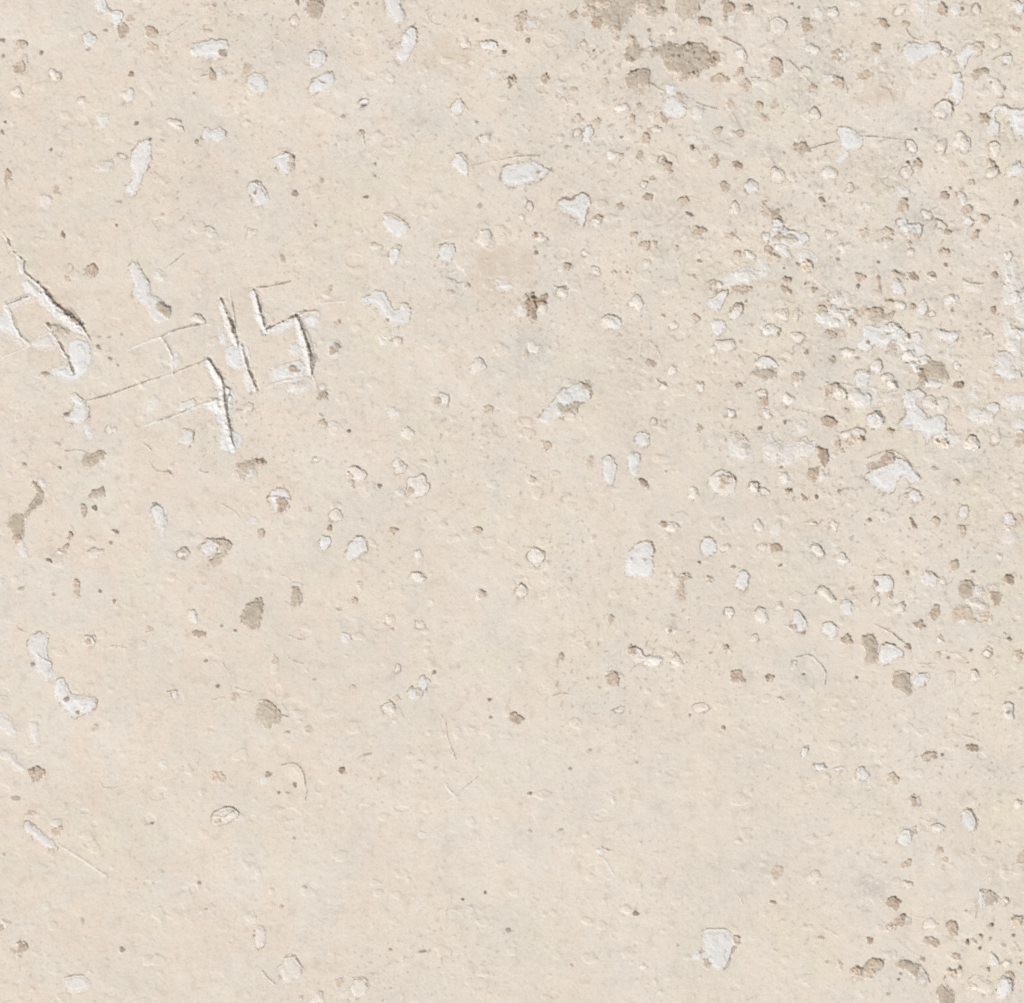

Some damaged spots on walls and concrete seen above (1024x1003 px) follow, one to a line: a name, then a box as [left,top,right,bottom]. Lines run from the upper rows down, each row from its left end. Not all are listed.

spalling [568,0,784,160]
peeling [555,192,604,228]
peeling [686,126,819,337]
peeling [857,184,924,247]
spalling [939,161,991,255]
peeling [537,379,595,424]
peeling [723,259,1024,530]
spalling [6,477,48,544]
spalling [239,597,264,630]
peeling [26,630,98,734]
spalling [255,699,288,729]
peeling [692,928,742,971]